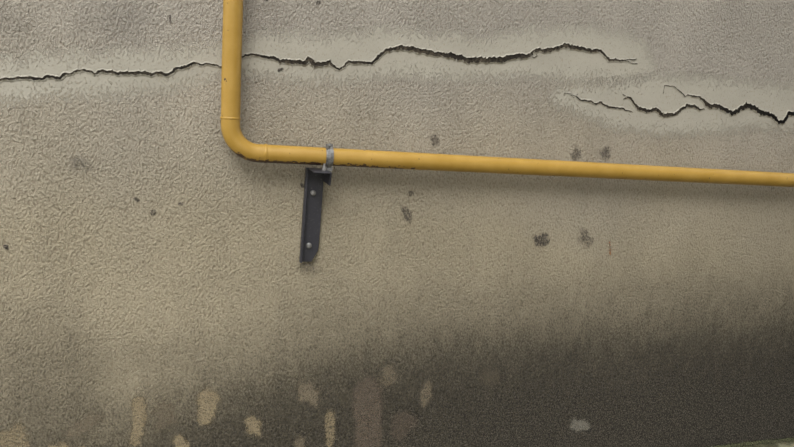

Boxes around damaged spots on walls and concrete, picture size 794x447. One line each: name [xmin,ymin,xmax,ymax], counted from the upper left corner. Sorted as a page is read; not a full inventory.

crack [0,60,222,83]
crack [242,42,638,71]
crack [564,84,794,125]
peeling [130,396,148,446]
peeling [196,387,220,426]
peeling [297,381,319,407]
peeling [325,412,335,447]
water stain [29,305,794,447]